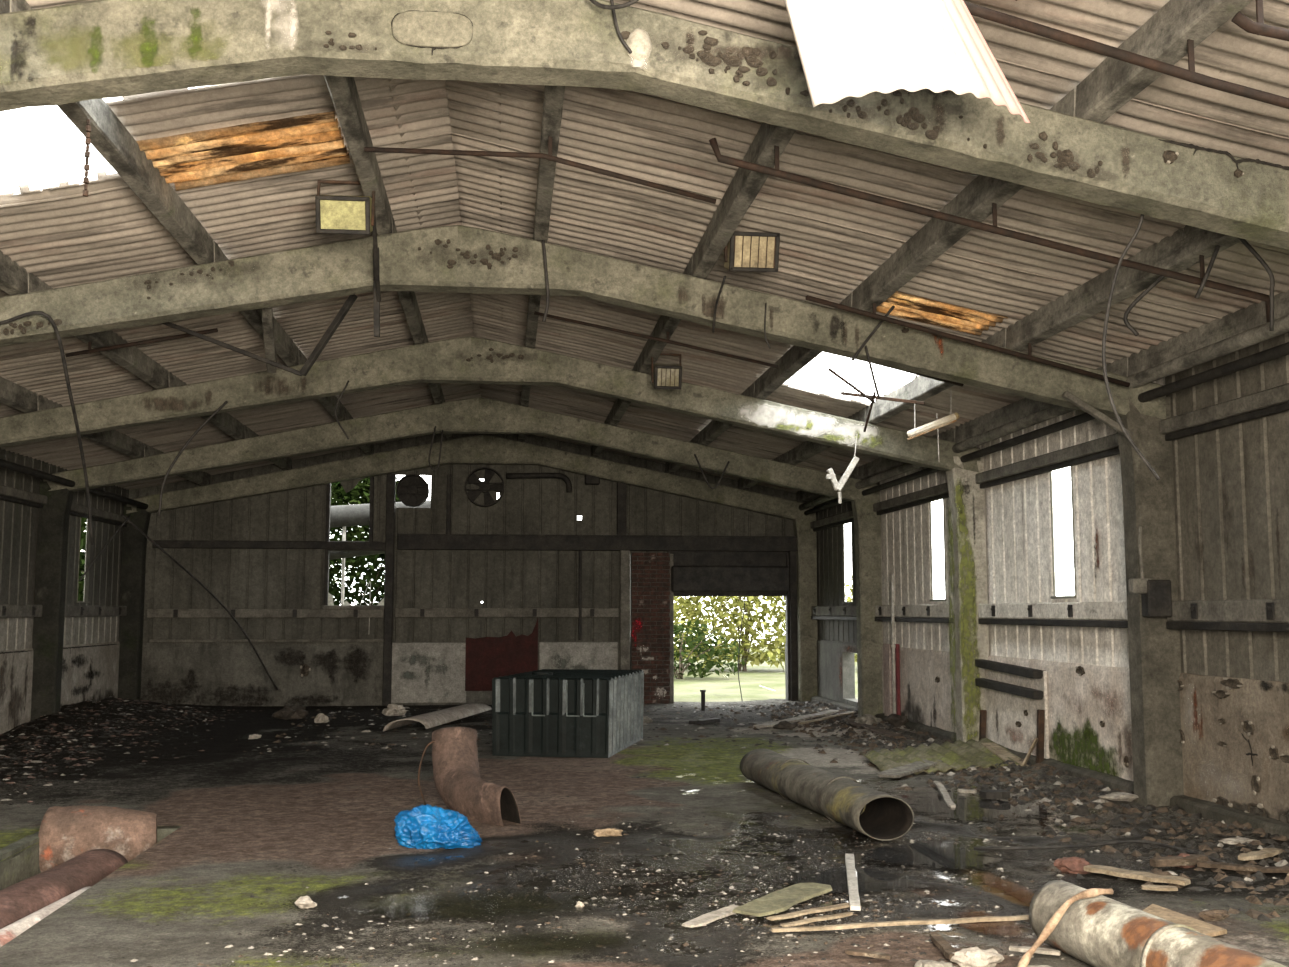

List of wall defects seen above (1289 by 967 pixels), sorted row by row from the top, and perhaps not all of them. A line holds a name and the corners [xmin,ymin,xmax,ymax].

spalling [661,30,810,96]
spalling [829,90,941,140]
spalling [1027,131,1103,178]
leakage [140,648,372,706]